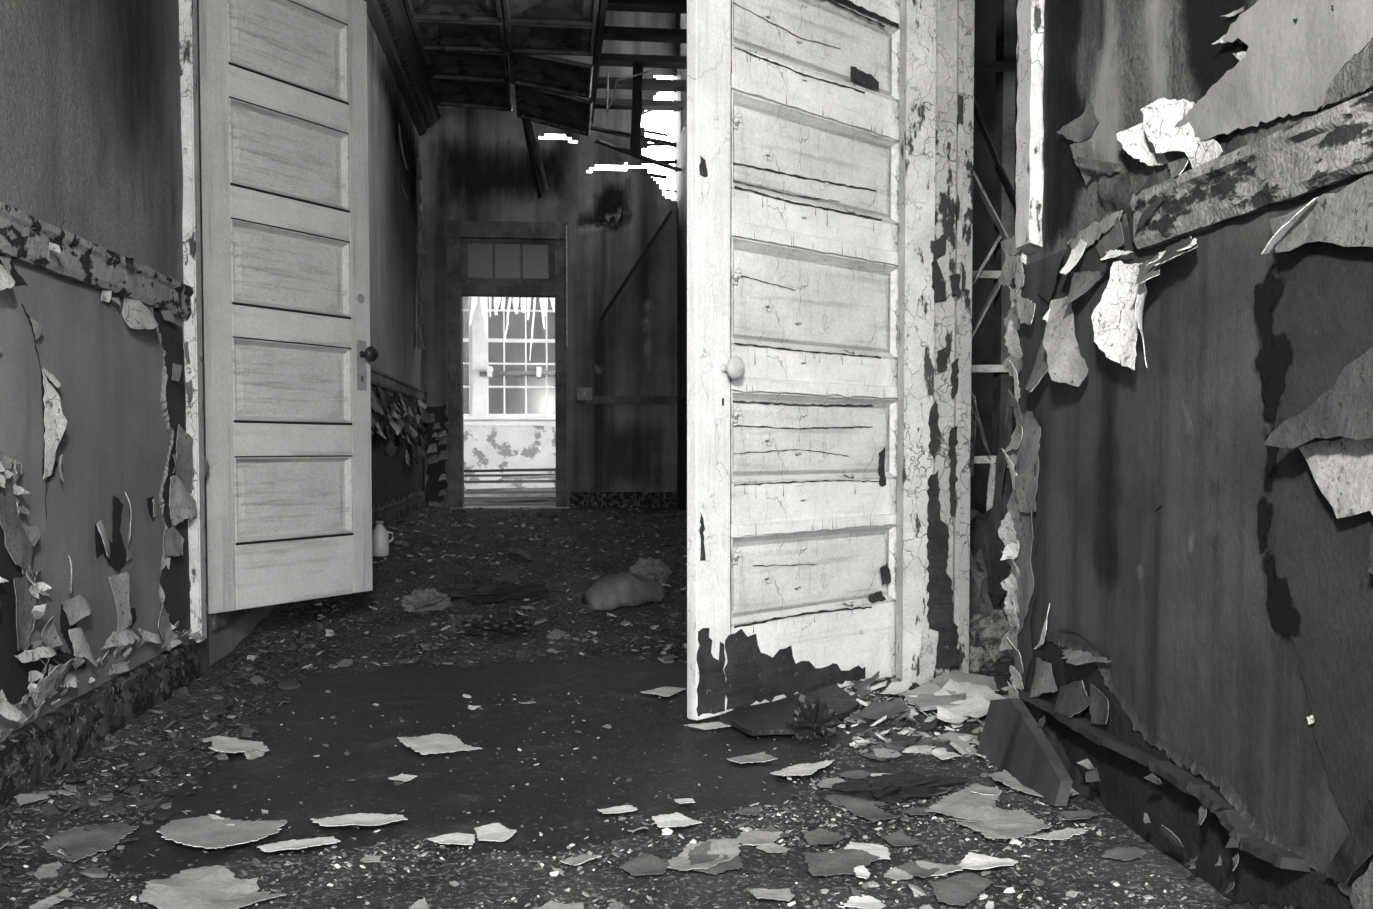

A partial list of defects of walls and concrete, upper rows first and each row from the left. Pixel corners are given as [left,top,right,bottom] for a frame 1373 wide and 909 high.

peeling [0,255,28,291]
peeling [931,233,961,302]
peeling [0,289,210,743]
peeling [371,384,449,509]
peeling [894,347,959,719]
peeling [998,0,1373,909]
peeling [686,628,865,730]
peeling [14,793,49,805]